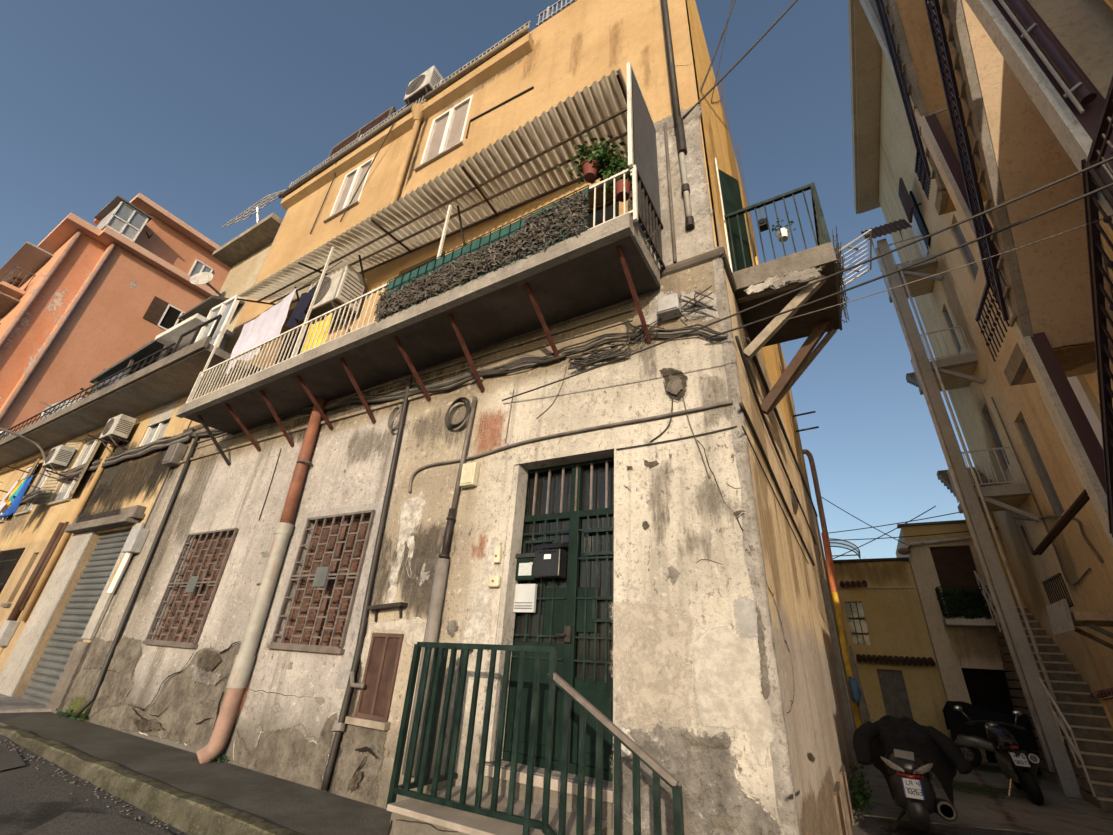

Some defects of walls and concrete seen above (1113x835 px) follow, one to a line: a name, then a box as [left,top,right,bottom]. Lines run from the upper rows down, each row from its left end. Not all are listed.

peeling [0,263,103,374]
spalling [746,267,822,295]
spalling [659,367,688,402]
rust [479,415,503,451]
leakage [76,438,175,523]
crack [697,440,743,531]
peeling [386,494,430,603]
spalling [65,636,242,745]